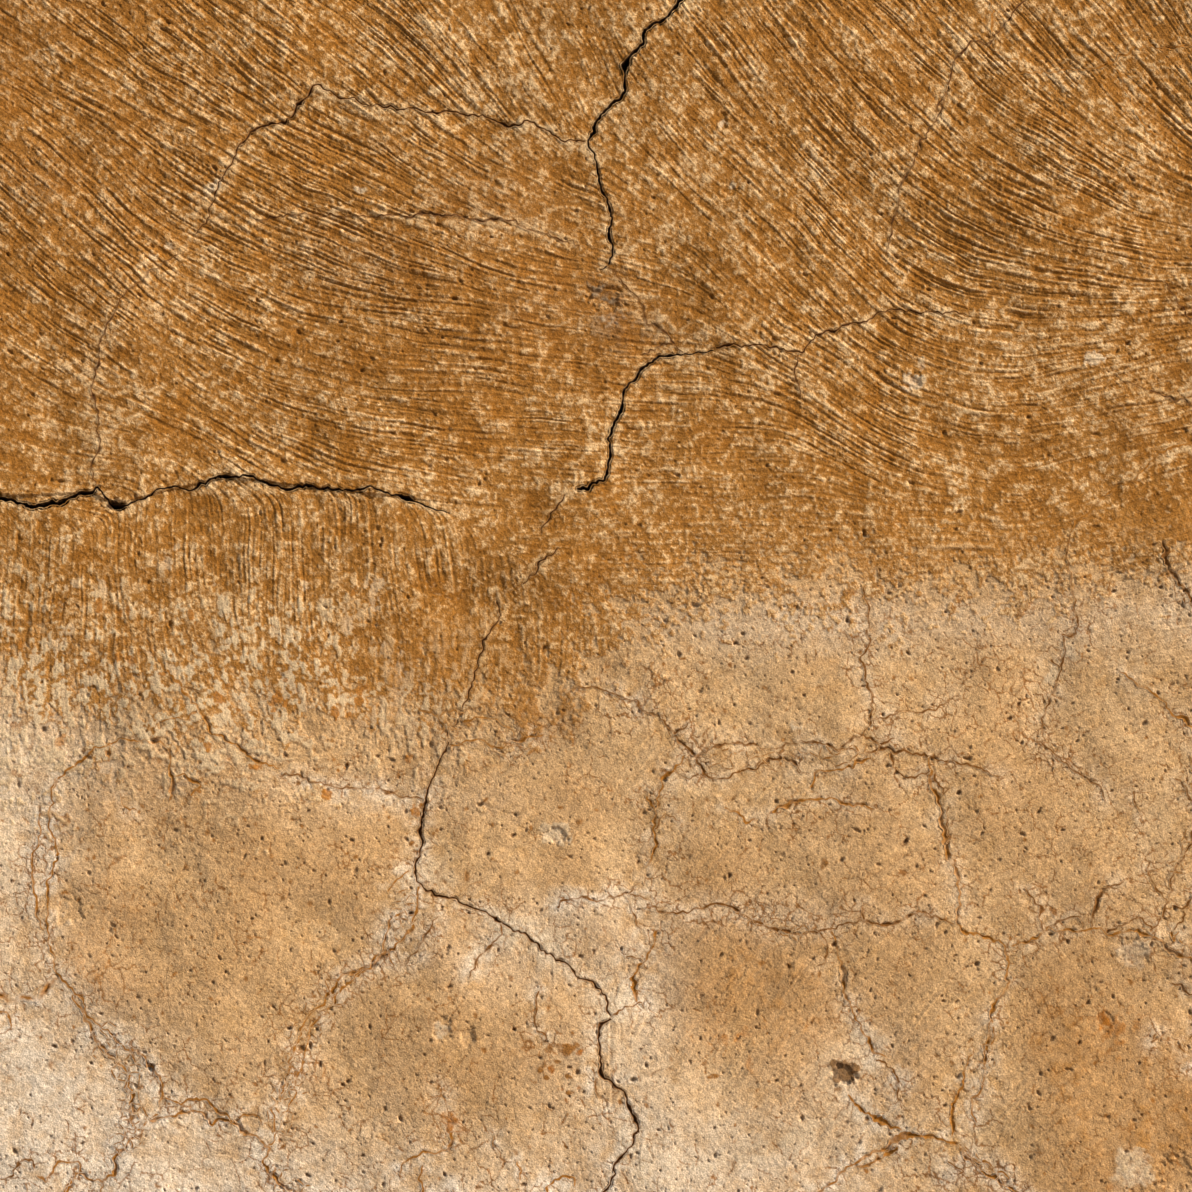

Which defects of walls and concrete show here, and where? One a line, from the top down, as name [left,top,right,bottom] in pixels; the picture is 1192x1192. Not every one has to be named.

crack [0,0,967,586]
crack [885,0,1192,256]
crack [1122,381,1192,407]
crack [1164,281,1192,320]
crack [1034,441,1192,823]
crack [0,587,1192,1192]